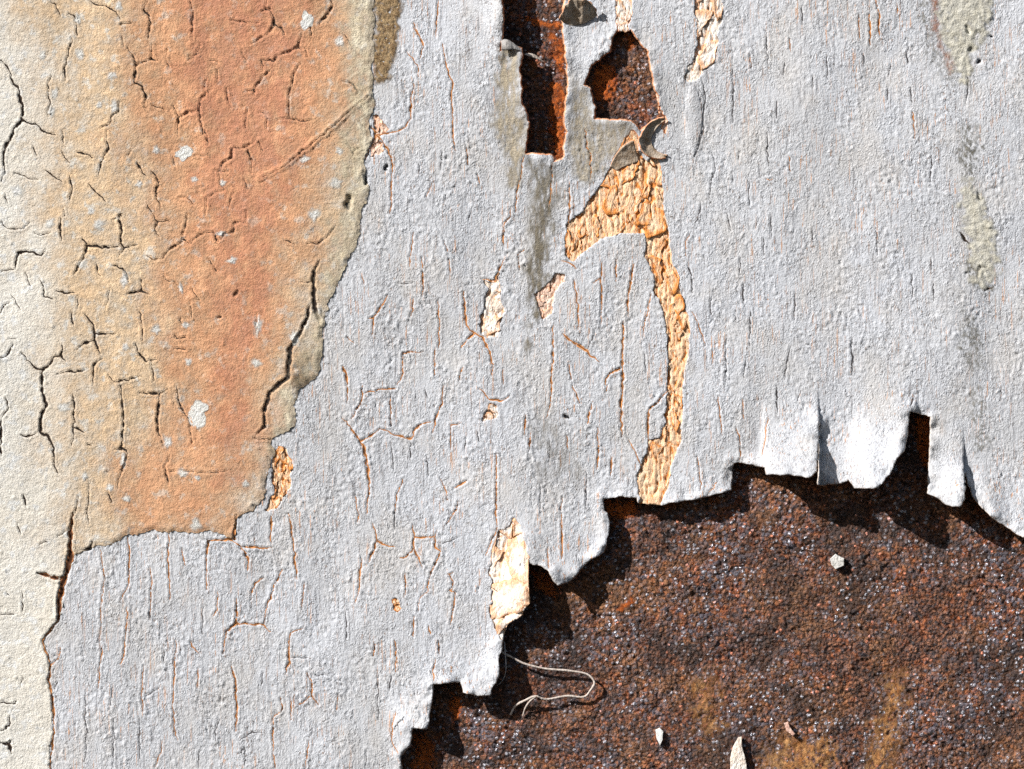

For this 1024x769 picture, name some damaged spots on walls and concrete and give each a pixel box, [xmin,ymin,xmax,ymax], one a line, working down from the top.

spalling [300,10,314,30]
spalling [175,145,193,161]
spalling [370,115,389,171]
crack [0,0,351,769]
spalling [188,400,208,428]
peeling [389,0,1024,769]
spalling [265,446,293,511]
crack [342,157,667,753]
corrosion [401,412,1024,769]